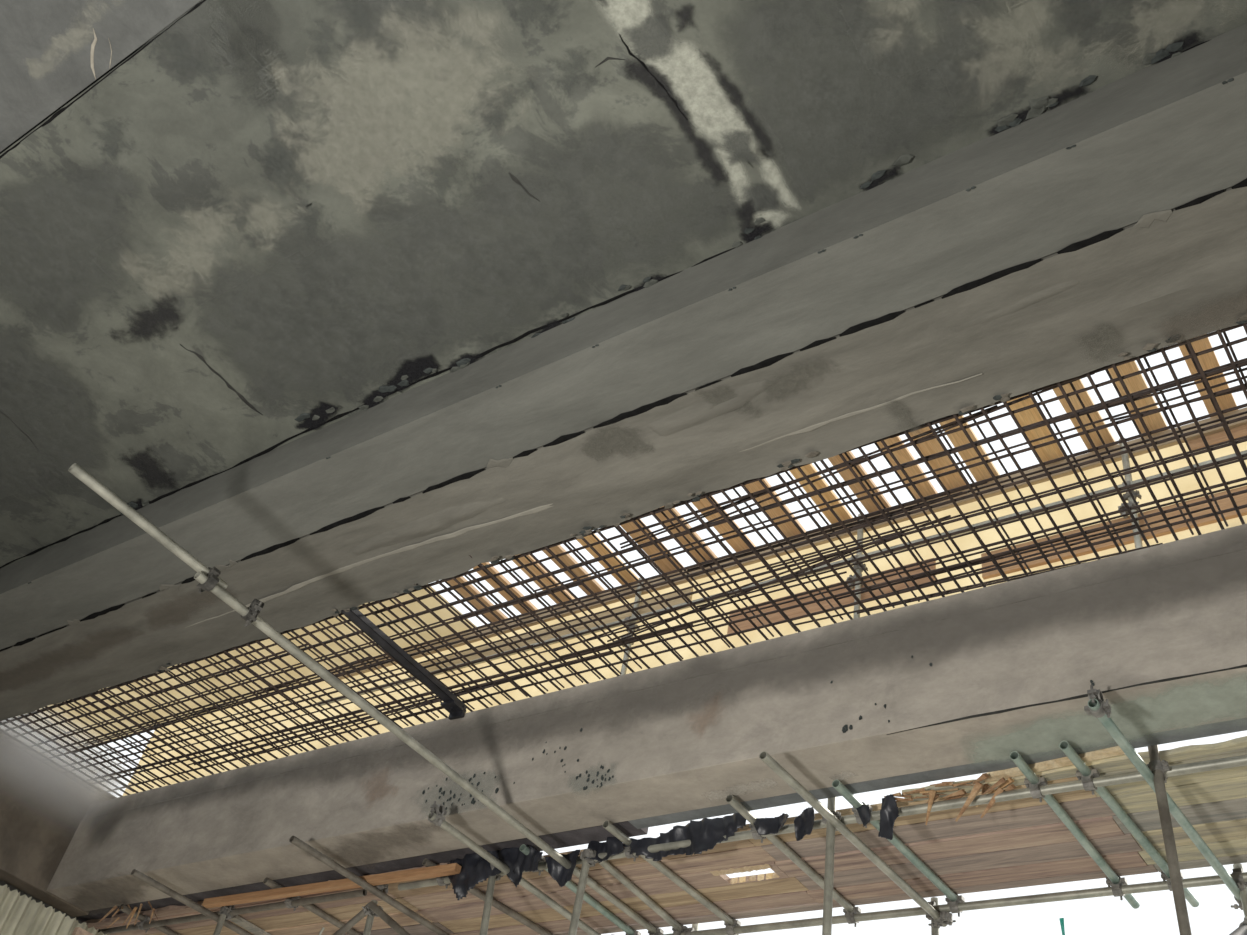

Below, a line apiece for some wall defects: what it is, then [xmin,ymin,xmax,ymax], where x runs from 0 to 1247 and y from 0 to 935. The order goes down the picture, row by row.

damp [150,0,308,105]
crack [596,57,625,67]
spalling [989,75,1097,135]
damp [200,0,1009,405]
spalling [358,354,482,411]
spalling [295,402,338,429]
crack [0,178,1247,652]
spalling [777,451,818,471]
spalling [121,499,150,515]
spalling [570,513,631,539]
spalling [485,555,514,567]
spalling [532,741,614,790]